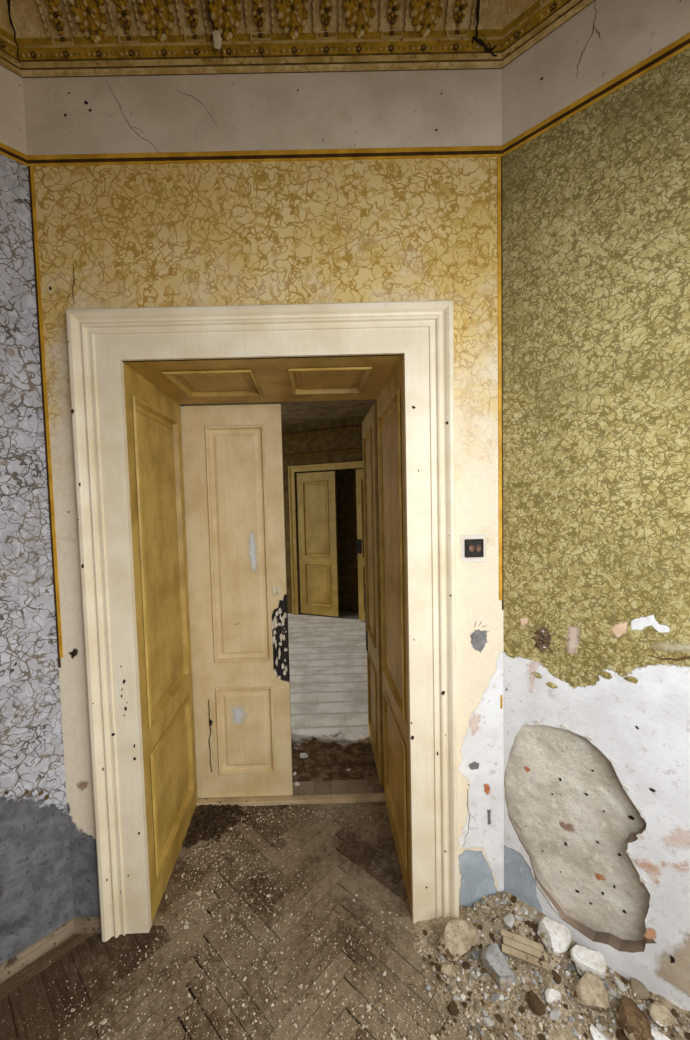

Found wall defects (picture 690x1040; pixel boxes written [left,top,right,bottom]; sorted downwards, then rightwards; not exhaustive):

crack [472,0,498,57]
crack [576,3,601,77]
flaking render [0,788,108,965]
peeling [458,615,690,1011]